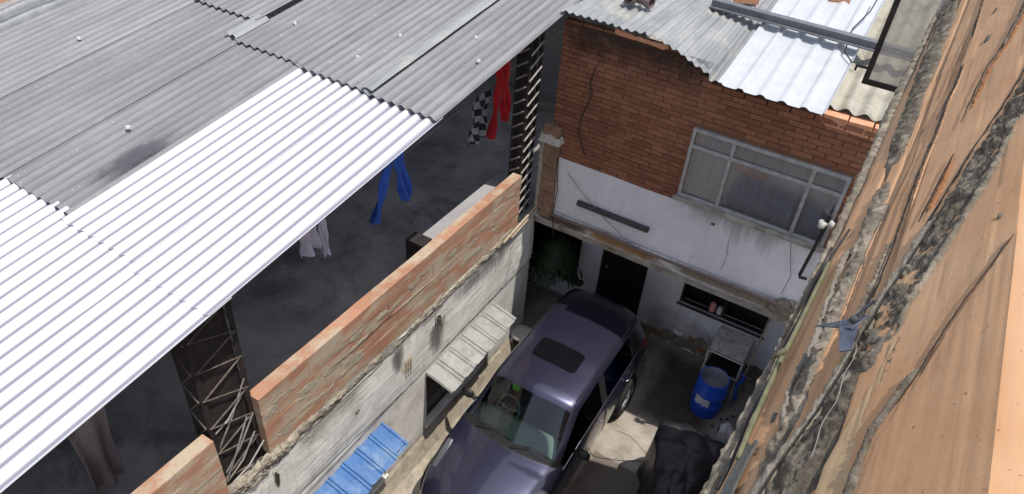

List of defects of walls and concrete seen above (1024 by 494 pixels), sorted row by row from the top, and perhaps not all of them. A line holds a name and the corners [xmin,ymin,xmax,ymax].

leakage [102,140,164,174]
spalling [700,0,1024,494]
spalling [228,228,513,494]
leakage [394,345,403,369]
flaking render [640,316,714,359]